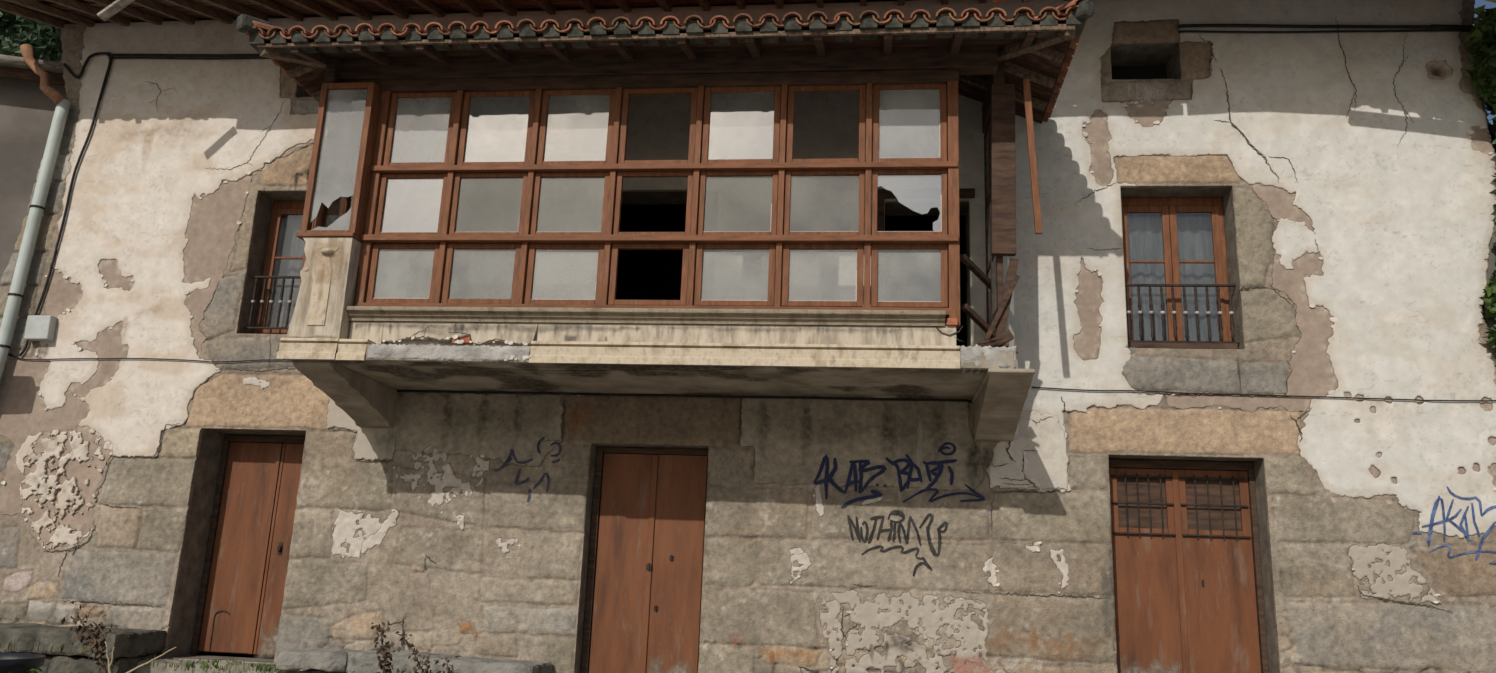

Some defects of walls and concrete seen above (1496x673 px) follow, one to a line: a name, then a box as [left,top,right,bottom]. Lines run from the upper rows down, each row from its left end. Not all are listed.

flaking render [1081,110,1114,186]
flaking render [1122,100,1172,127]
crack [1198,34,1297,183]
crack [1335,15,1357,117]
crack [1393,32,1414,147]
flaking render [44,269,83,317]
flaking render [98,259,135,291]
flaking render [183,132,328,357]
spalling [935,318,1035,403]
flaking render [1073,258,1104,361]
flaking render [1164,183,1392,423]
flaking render [0,321,129,516]